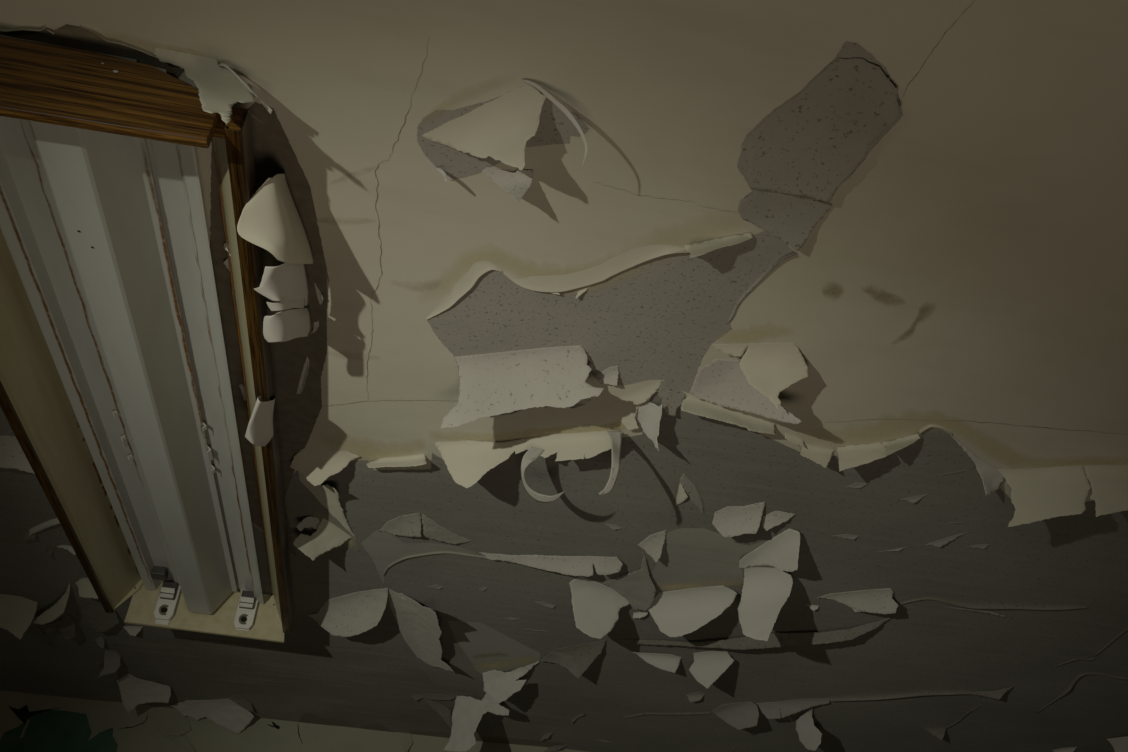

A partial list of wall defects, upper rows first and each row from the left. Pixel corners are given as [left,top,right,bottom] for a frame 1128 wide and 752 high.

peeling [0,23,329,596]
crack [312,37,436,407]
peeling [417,41,903,451]
flaking render [0,392,1128,752]